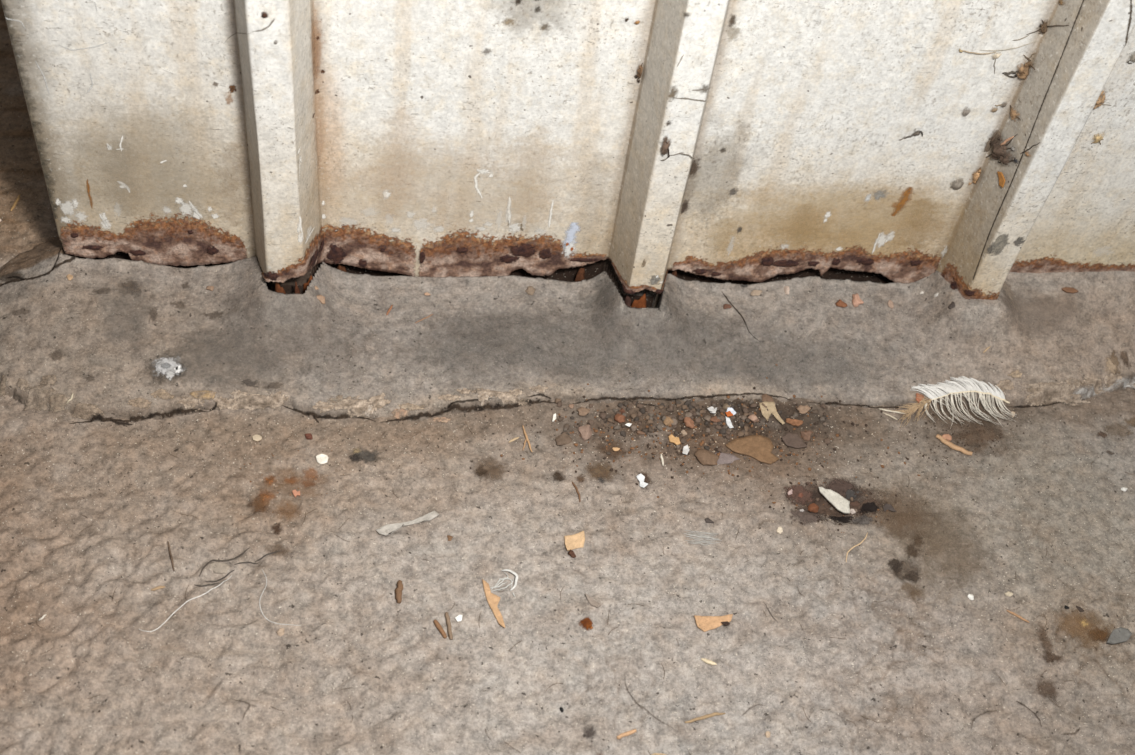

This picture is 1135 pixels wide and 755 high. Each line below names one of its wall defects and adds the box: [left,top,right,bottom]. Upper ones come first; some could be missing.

rust [60,213,248,266]
rust [261,224,1000,300]
rust [1010,255,1135,273]
crack [69,403,217,425]
crack [284,393,898,423]